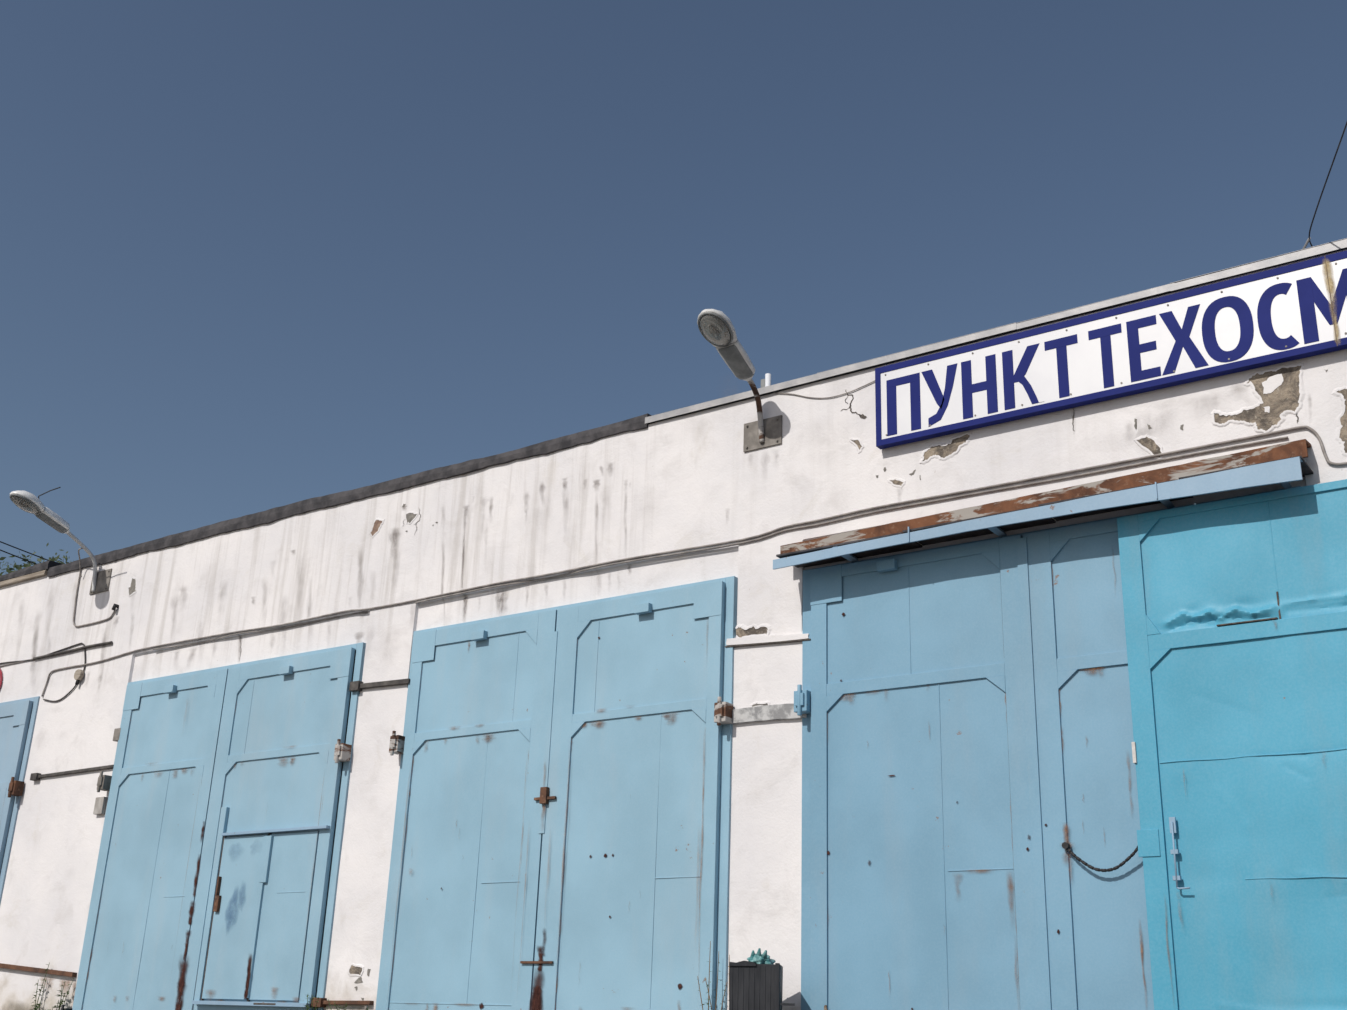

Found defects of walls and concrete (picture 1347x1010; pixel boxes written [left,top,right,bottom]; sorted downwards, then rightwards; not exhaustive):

peeling [1210,362,1306,433]
peeling [1331,386,1347,457]
peeling [876,431,972,489]
rust [175,859,200,1010]
rust [531,933,557,1010]